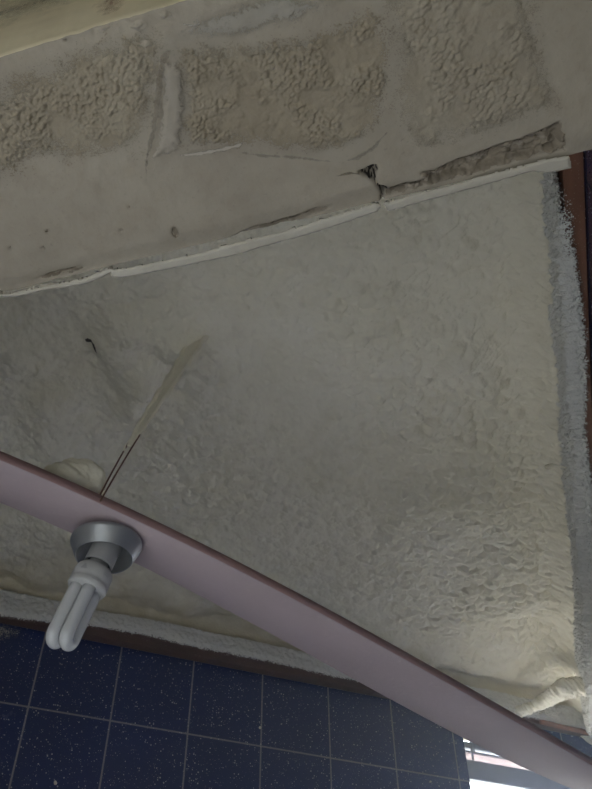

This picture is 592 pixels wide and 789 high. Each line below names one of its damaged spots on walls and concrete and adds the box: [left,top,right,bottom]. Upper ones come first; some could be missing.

crack [339,164,387,198]